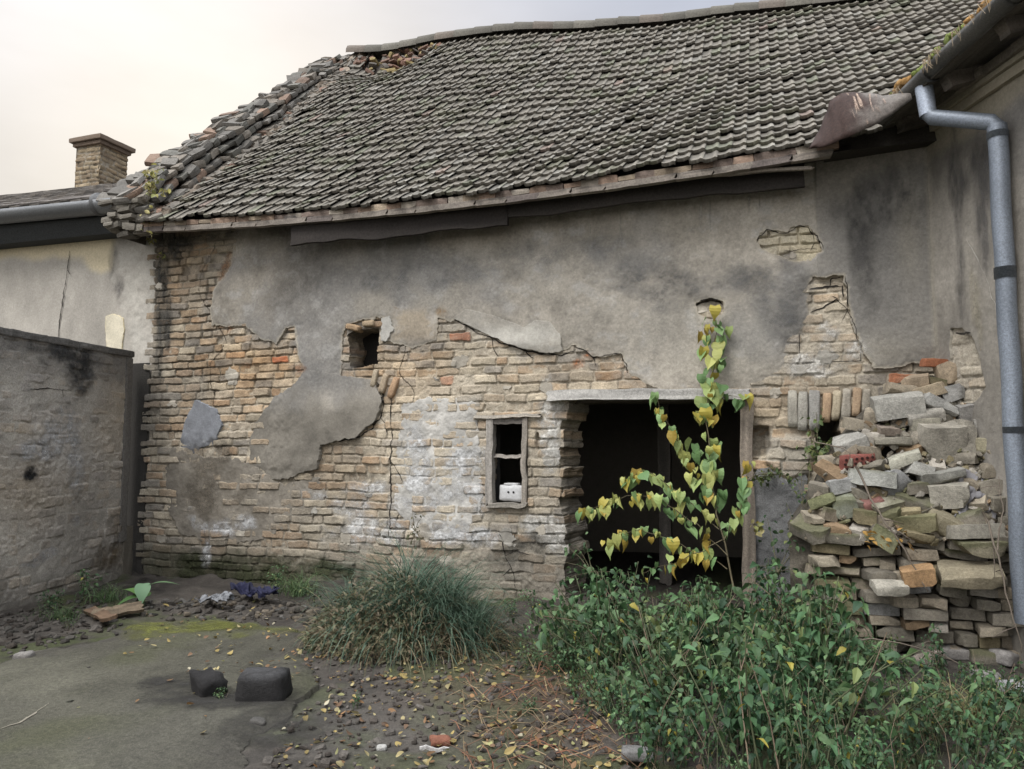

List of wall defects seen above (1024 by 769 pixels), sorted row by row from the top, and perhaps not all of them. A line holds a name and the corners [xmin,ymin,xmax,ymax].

flaking render [757,226,822,262]
crack [58,251,70,337]
damp [51,343,92,394]
flaking render [136,230,653,603]
flaking render [729,276,934,544]
flaking render [938,328,986,419]
crack [338,382,402,540]
peeling [918,448,989,485]
peeling [940,499,1008,531]